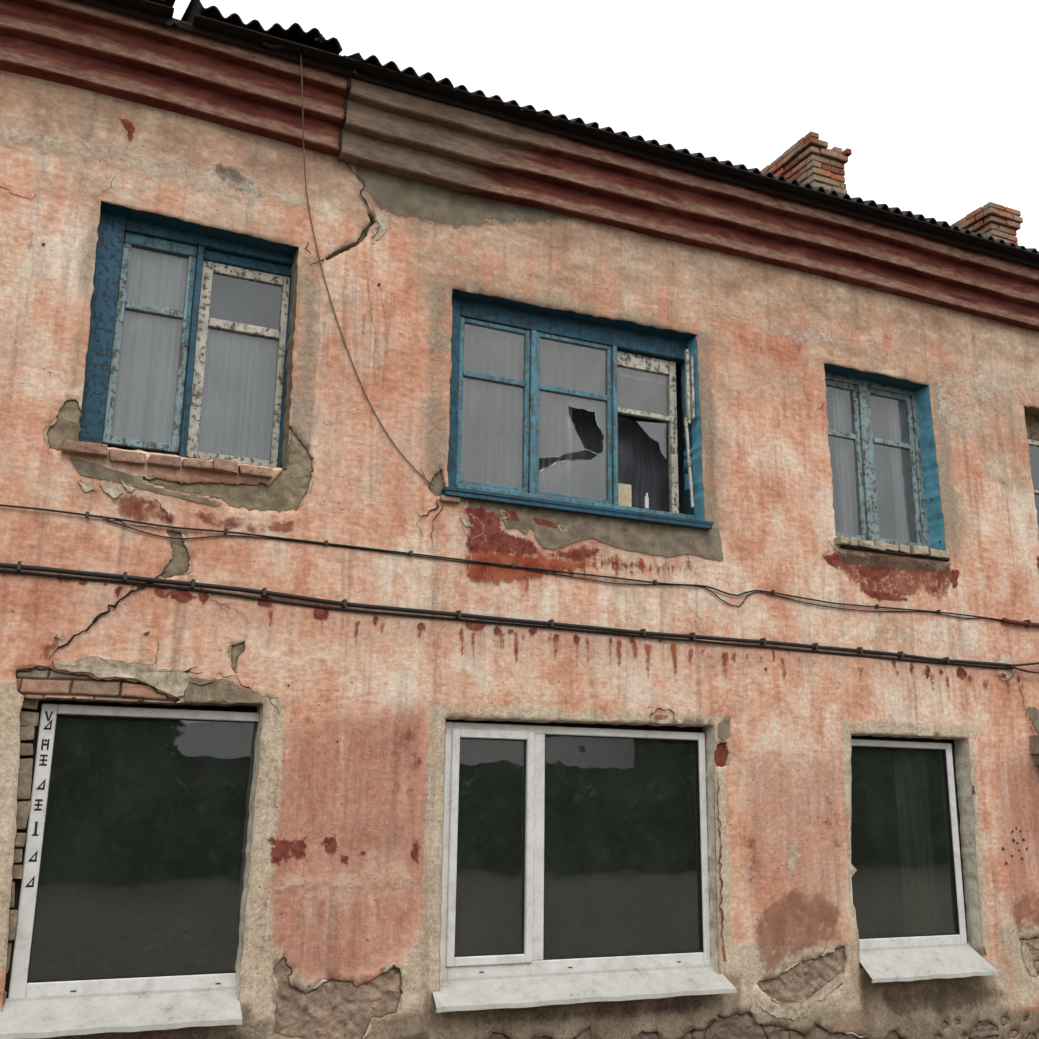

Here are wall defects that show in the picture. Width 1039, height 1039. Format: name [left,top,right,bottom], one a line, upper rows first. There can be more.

crack [304,77,388,381]
flaking render [44,400,82,451]
crack [102,498,172,531]
flaking render [78,427,313,604]
peeling [460,505,599,561]
peeling [824,552,960,601]
crack [16,571,166,675]
flaking render [16,636,263,703]
crack [150,636,276,698]
flaking render [271,957,402,1039]
flaking render [757,946,845,1004]
flaking render [1019,937,1039,977]